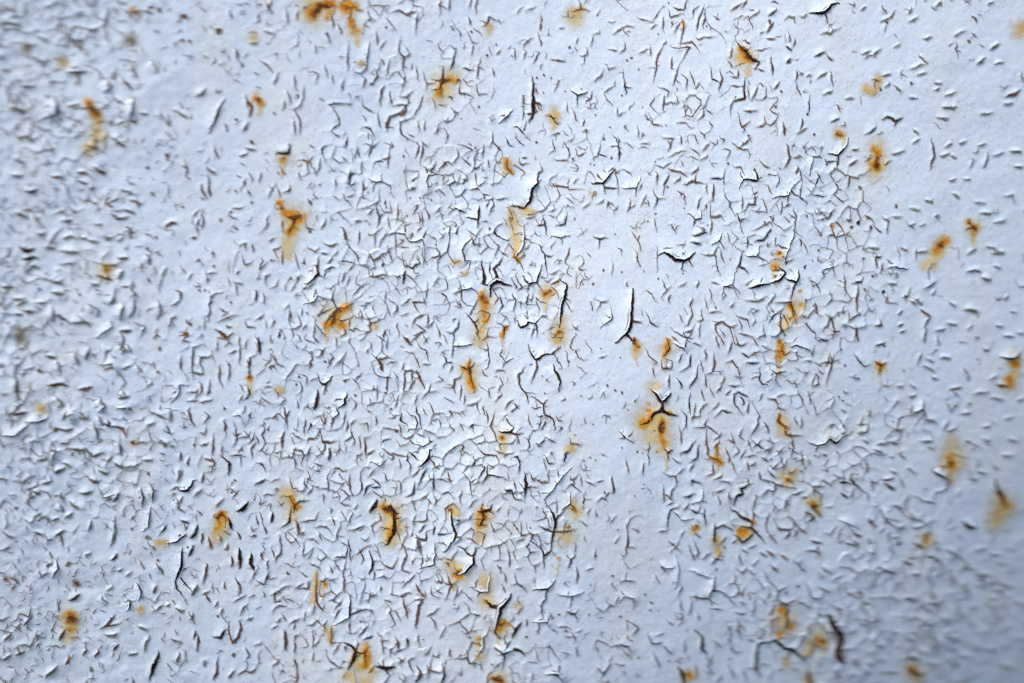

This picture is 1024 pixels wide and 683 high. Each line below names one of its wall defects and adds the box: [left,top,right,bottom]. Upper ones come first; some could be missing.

corrosion [304,0,365,66]
crack [731,0,796,71]
crack [851,0,1005,66]
crack [490,75,607,170]
corrosion [868,139,885,177]
crack [866,54,1024,199]
corrosion [276,200,306,259]
corrosion [921,235,950,272]
crack [589,283,658,343]
corrosion [634,338,673,472]
corrosion [379,502,403,548]
crack [0,549,91,683]